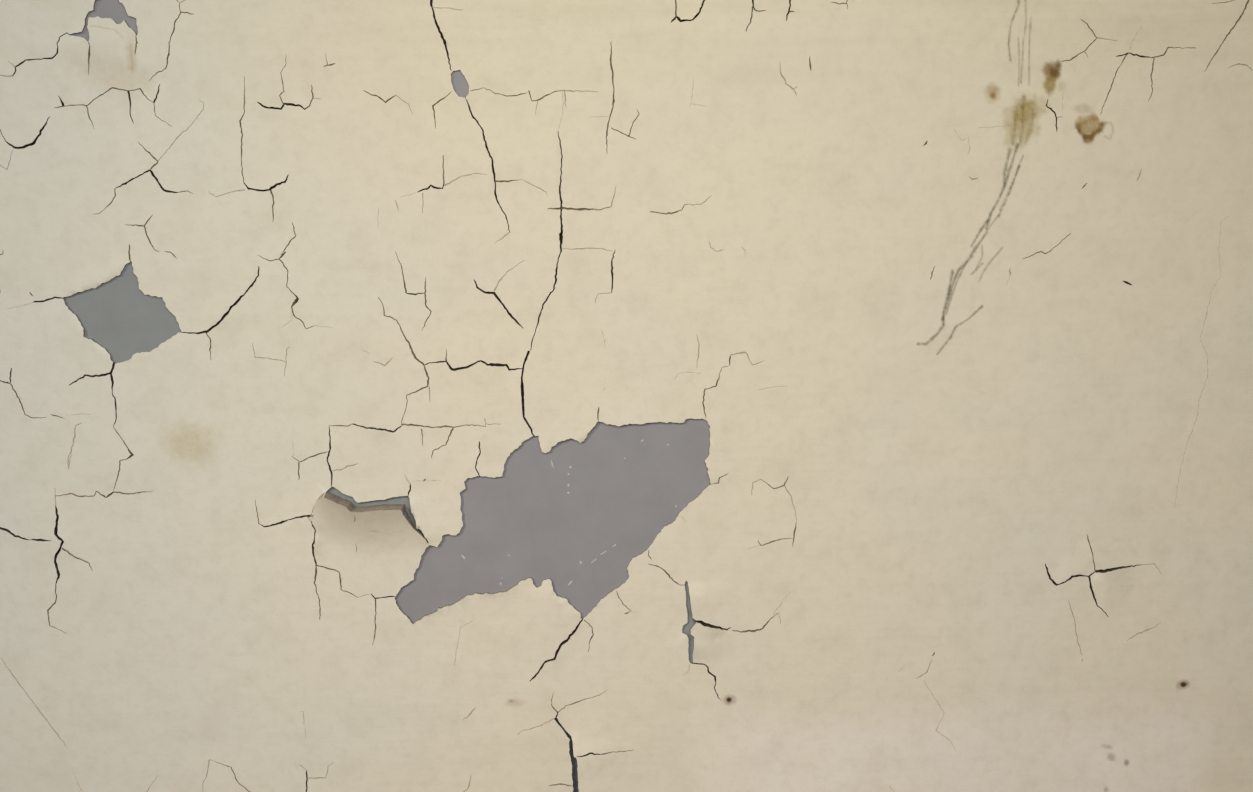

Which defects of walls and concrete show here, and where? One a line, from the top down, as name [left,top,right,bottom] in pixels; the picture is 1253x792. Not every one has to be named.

peeling [70,0,138,41]
peeling [451,70,469,98]
crack [671,0,705,22]
crack [1061,0,1252,113]
crack [0,0,336,376]
peeling [63,262,181,364]
crack [255,0,639,646]
crack [0,362,151,633]
peeling [395,418,711,624]
crack [648,550,789,699]
crack [1045,535,1160,662]
crack [519,618,632,792]